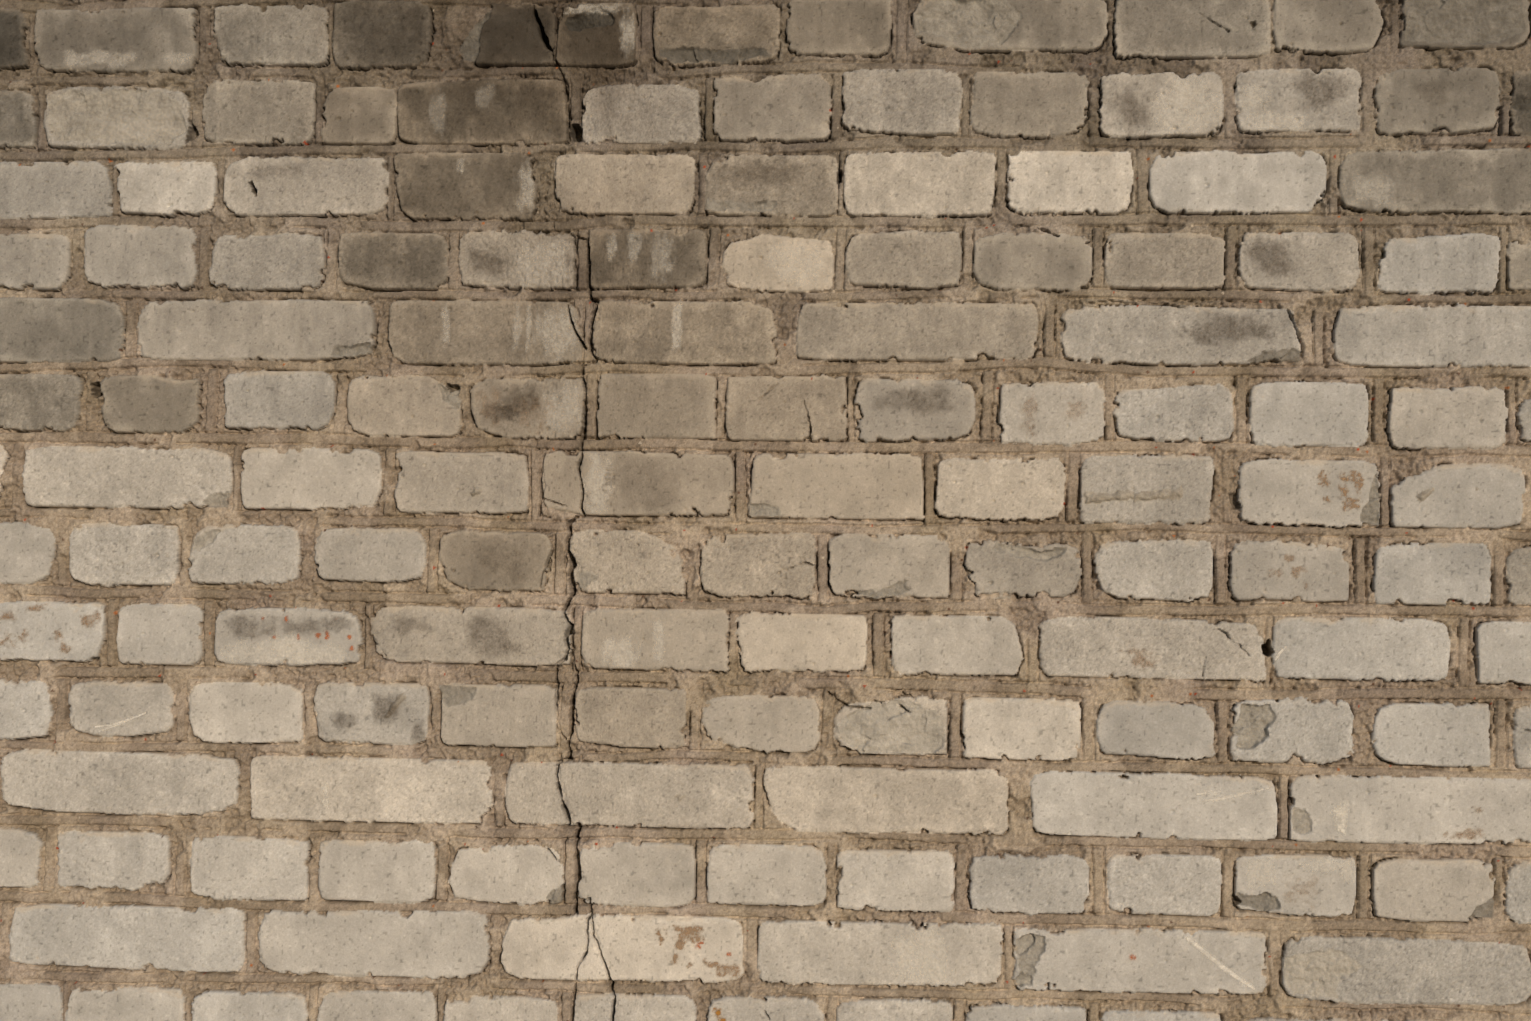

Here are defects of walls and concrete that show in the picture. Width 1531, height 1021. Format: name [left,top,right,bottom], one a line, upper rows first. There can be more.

crack [533,0,616,1021]
rust [1318,470,1364,510]
rust [656,925,740,976]